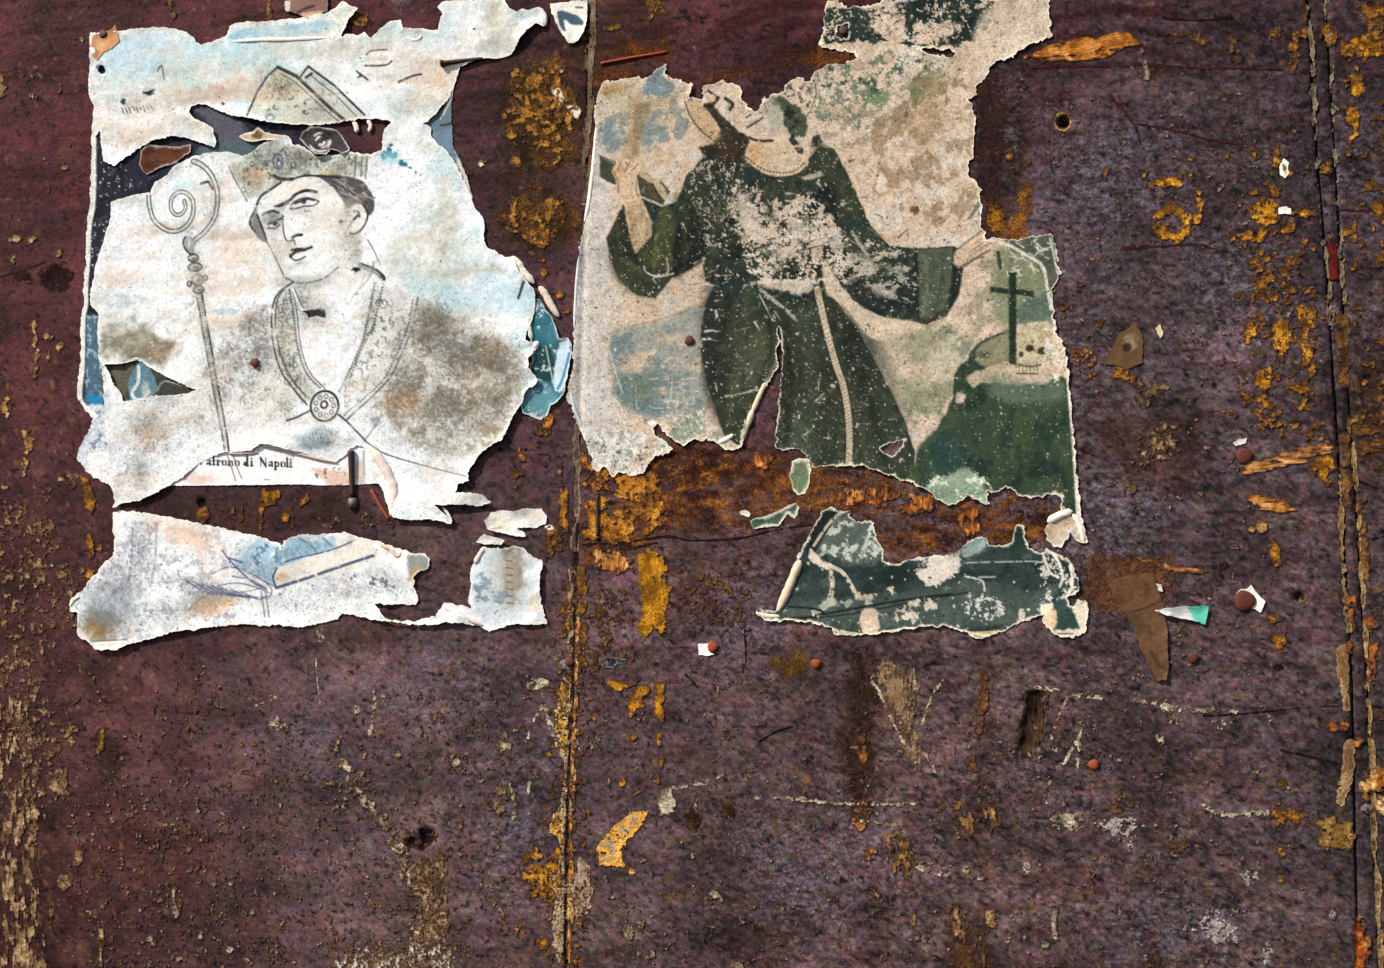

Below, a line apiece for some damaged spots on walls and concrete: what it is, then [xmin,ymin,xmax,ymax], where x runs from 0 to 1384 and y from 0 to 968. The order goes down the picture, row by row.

peeling [351,9,369,27]
corrosion [492,34,857,260]
peeling [8,234,38,264]
corrosion [566,441,1076,576]